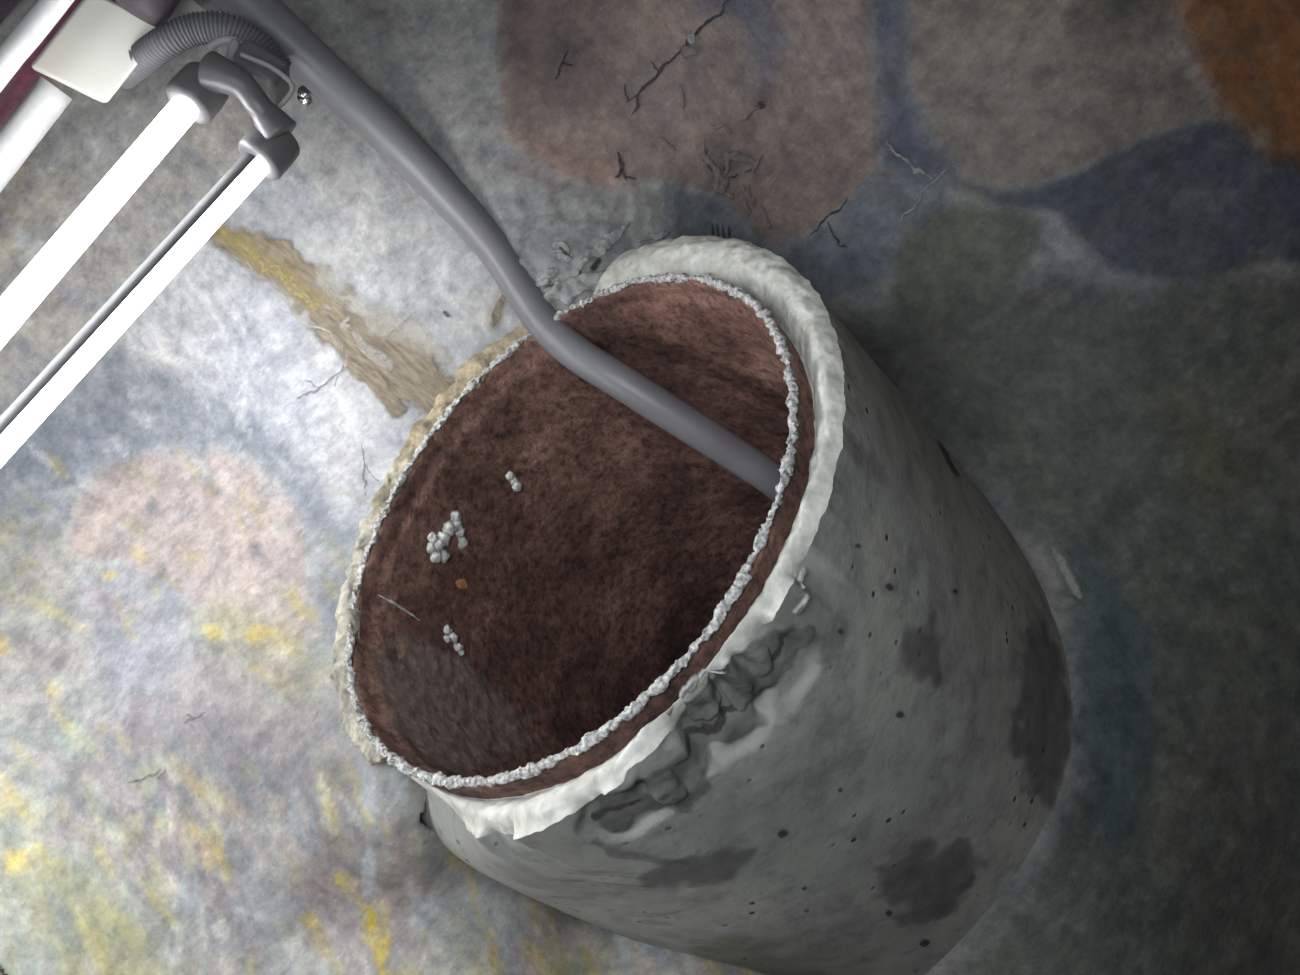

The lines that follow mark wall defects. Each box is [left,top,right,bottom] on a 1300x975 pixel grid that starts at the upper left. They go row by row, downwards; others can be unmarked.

crack [555,51,573,79]
crack [624,0,729,116]
crack [615,152,635,180]
crack [811,199,847,248]
spalling [591,567,815,832]